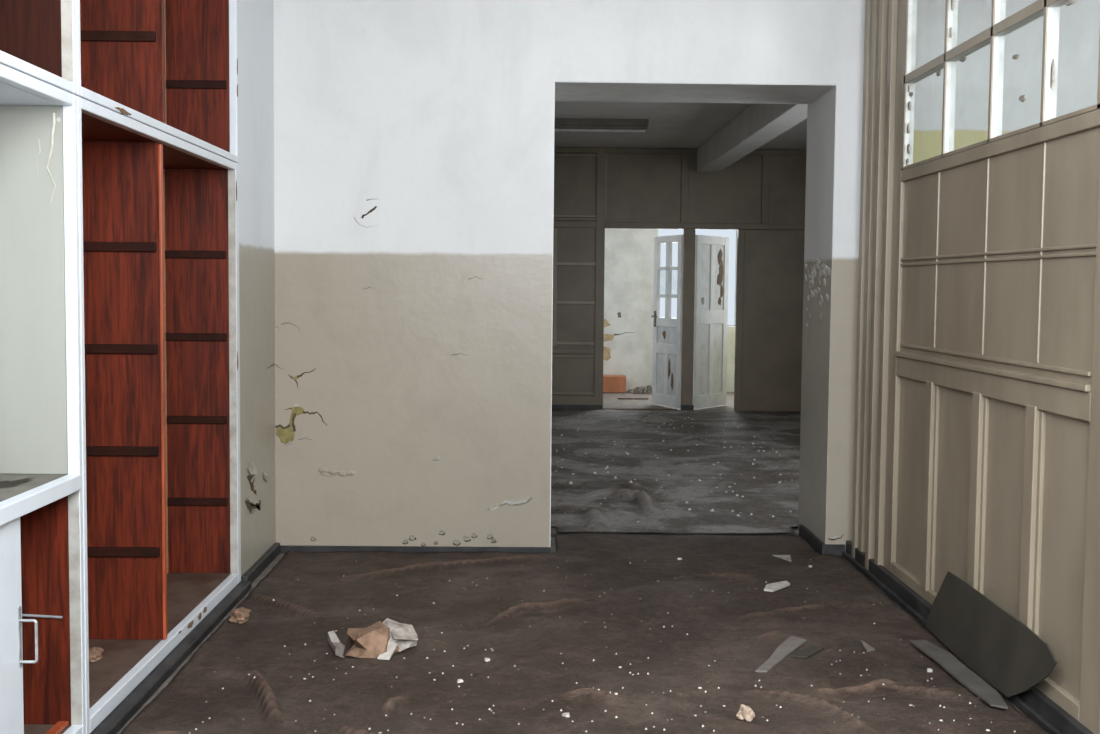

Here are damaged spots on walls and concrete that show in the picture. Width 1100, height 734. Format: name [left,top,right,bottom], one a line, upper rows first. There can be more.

peeling [275,404,327,446]
peeling [245,462,268,514]